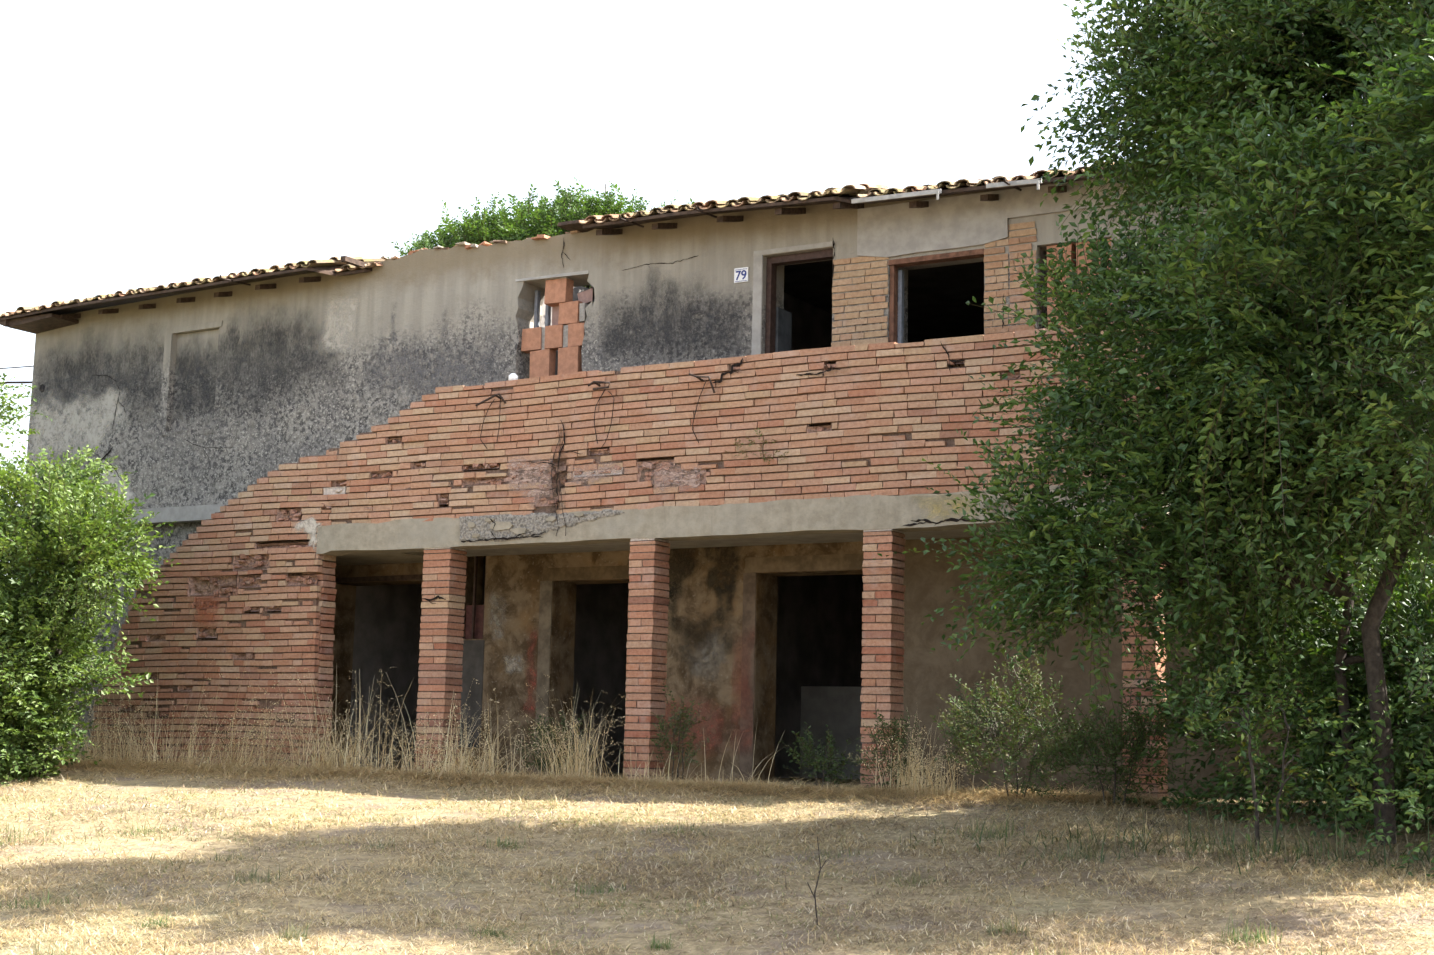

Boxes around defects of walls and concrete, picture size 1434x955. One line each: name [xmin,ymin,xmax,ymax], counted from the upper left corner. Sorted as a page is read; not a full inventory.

damp [605,298,743,354]
damp [38,352,161,413]
damp [176,331,332,411]
spalling [276,507,303,522]
peeling [321,480,376,513]
spalling [438,448,707,543]
spalling [187,542,313,612]
spalling [285,575,318,587]
damp [667,546,740,669]